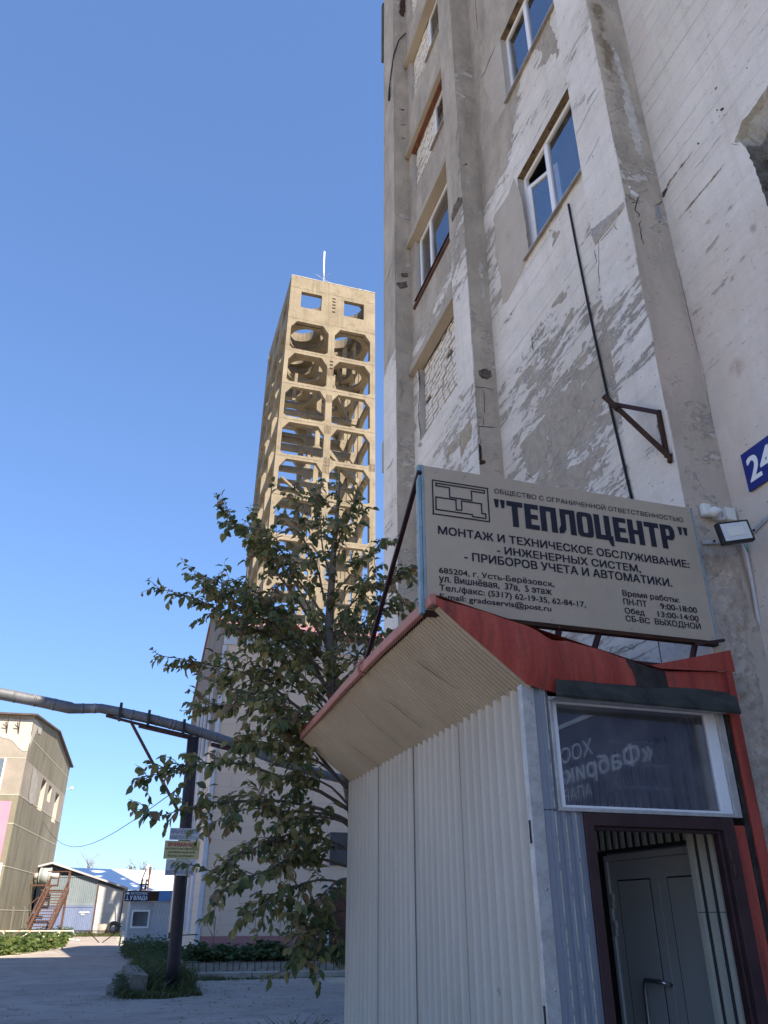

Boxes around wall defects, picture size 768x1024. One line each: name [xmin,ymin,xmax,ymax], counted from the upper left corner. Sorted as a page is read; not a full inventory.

peeling [532,16,559,70]
spalling [734,86,768,206]
spalling [591,186,639,245]
crack [591,196,662,282]
peeling [544,291,574,359]